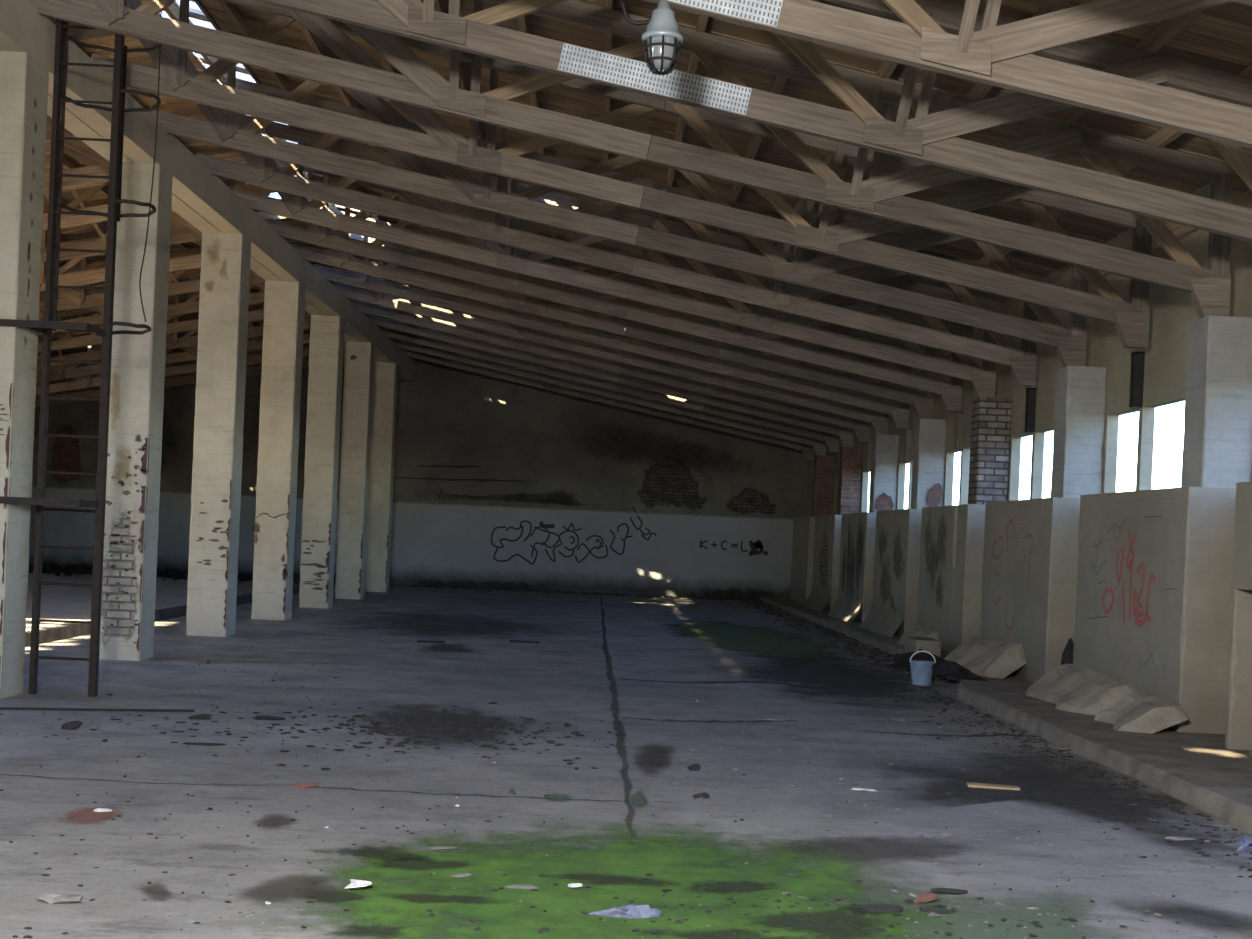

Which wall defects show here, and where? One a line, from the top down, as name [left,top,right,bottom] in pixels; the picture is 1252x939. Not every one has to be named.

spalling [0,383,14,508]
flaking render [101,435,150,651]
flaking render [638,463,706,510]
flaking render [727,488,775,514]
crack [319,596,810,838]